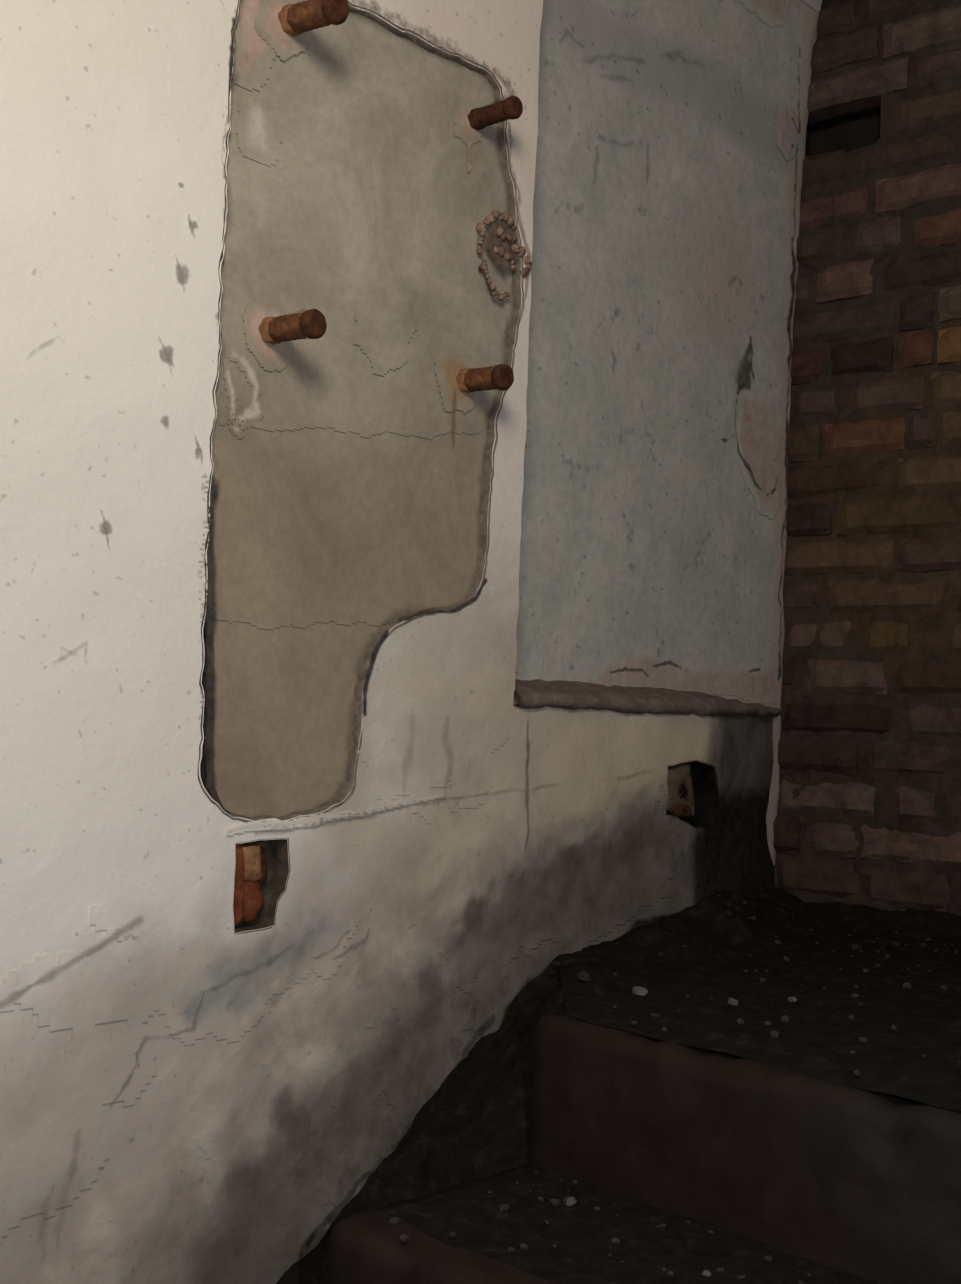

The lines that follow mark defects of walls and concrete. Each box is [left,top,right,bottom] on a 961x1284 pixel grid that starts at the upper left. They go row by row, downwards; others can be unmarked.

corrosion [254,0,312,61]
corrosion [243,299,294,372]
flaking render [196,0,532,822]
corrosion [434,346,480,414]
peeling [722,336,786,519]
crack [226,792,460,835]
water stain [358,679,510,824]
crack [525,728,538,849]
spalling [233,838,291,934]
crack [0,918,141,1006]
water stain [0,884,362,1244]
water stain [145,771,687,1284]